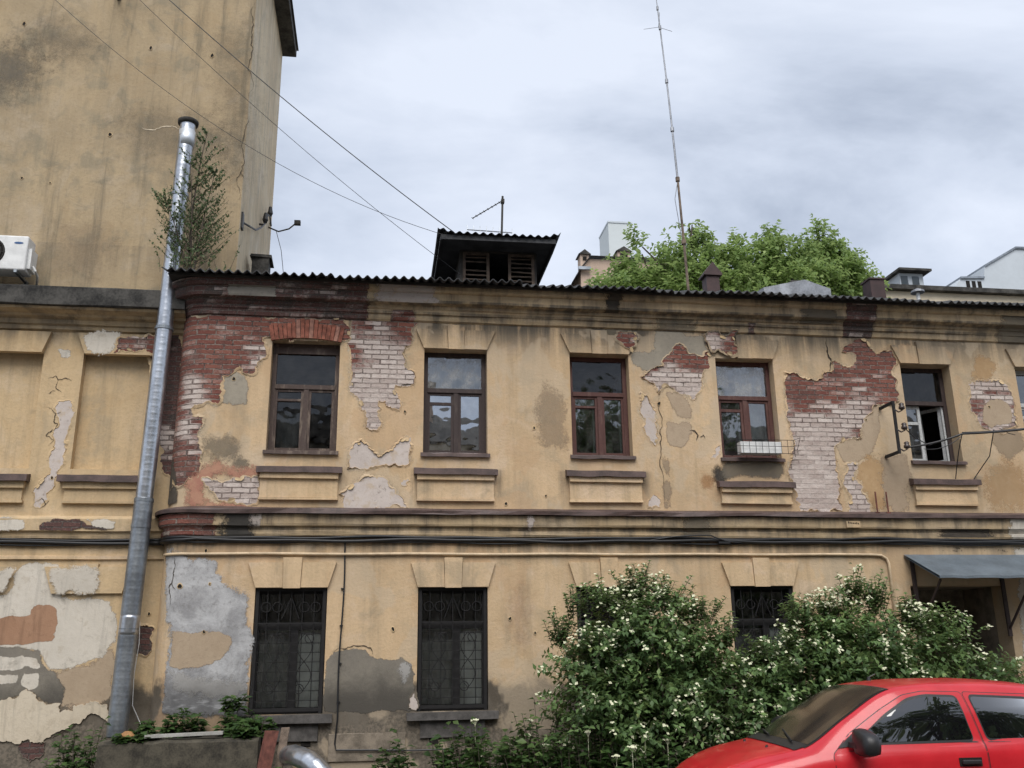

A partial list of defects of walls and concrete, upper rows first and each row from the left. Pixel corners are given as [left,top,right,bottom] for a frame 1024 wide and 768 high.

crack [237,7,254,199]
flaking render [31,400,76,509]
crack [46,376,70,444]
flaking render [81,329,155,374]
flaking render [158,314,421,527]
flaking render [638,329,739,446]
flaking render [783,338,900,518]
flaking render [966,354,1019,435]
flaking render [39,518,116,531]
peeling [0,562,118,763]
leakage [323,648,415,714]